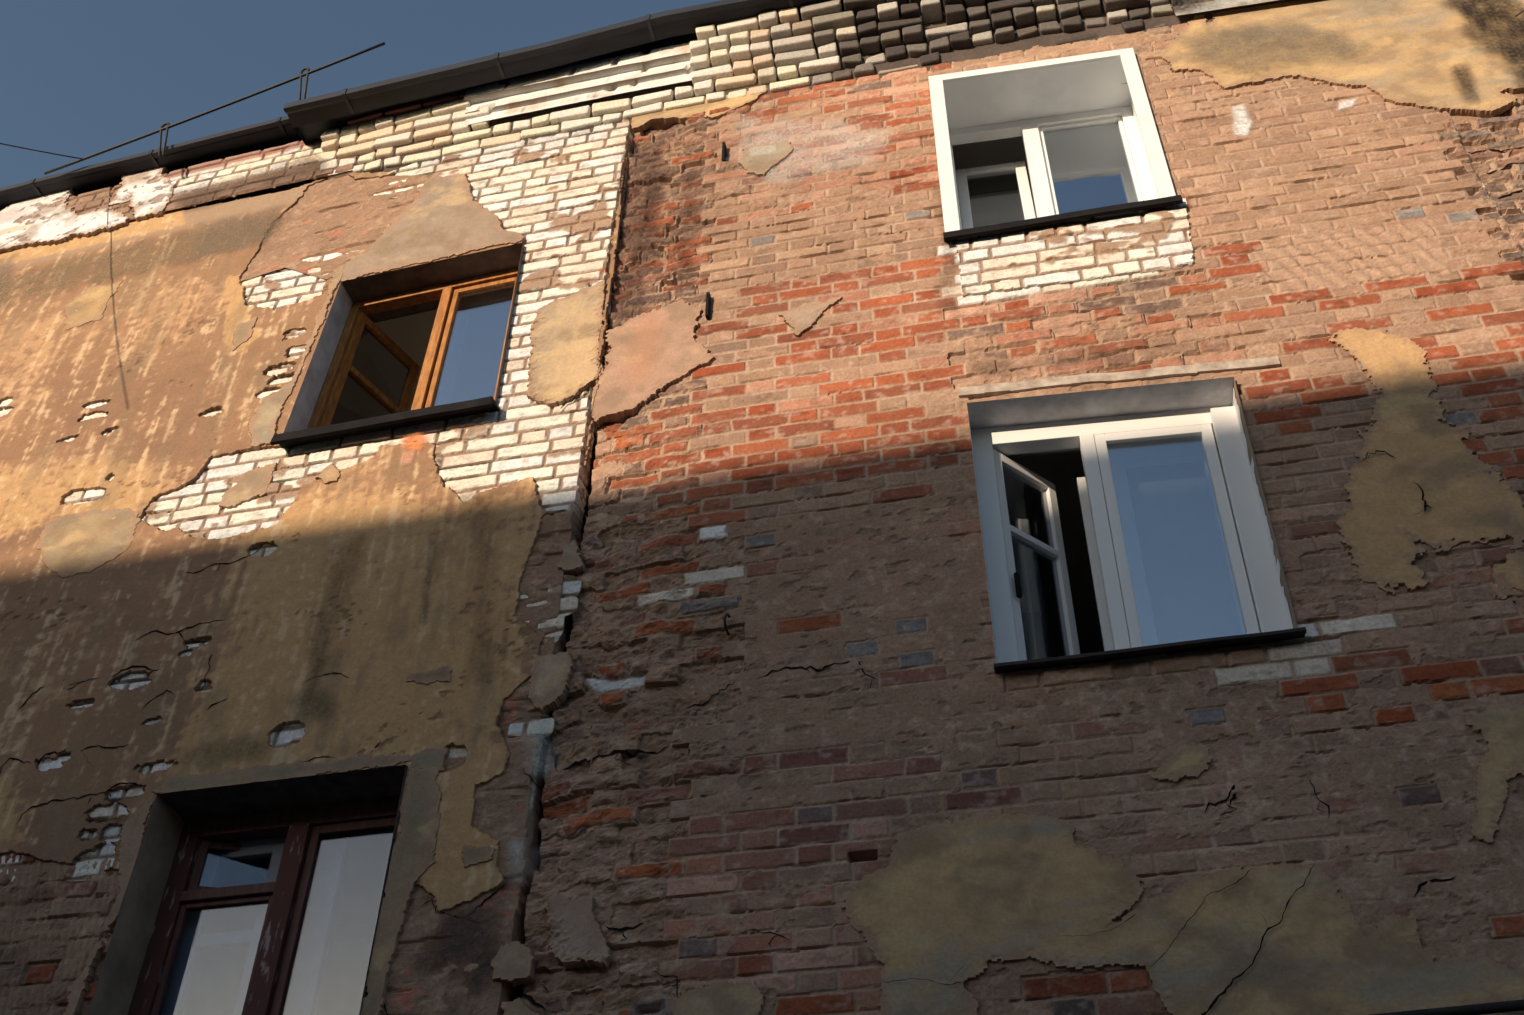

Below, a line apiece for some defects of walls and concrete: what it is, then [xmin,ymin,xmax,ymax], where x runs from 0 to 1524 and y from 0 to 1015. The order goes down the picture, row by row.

peeling [1159,0,1524,118]
damp [1454,67,1472,92]
damp [1449,0,1524,86]
peeling [0,166,176,254]
flaking render [141,90,767,657]
crack [560,260,617,652]
peeling [1326,327,1524,603]
crack [20,619,227,709]
crack [0,744,138,825]
crack [523,733,670,872]
peeling [842,813,1524,1015]
crack [1201,863,1315,1015]